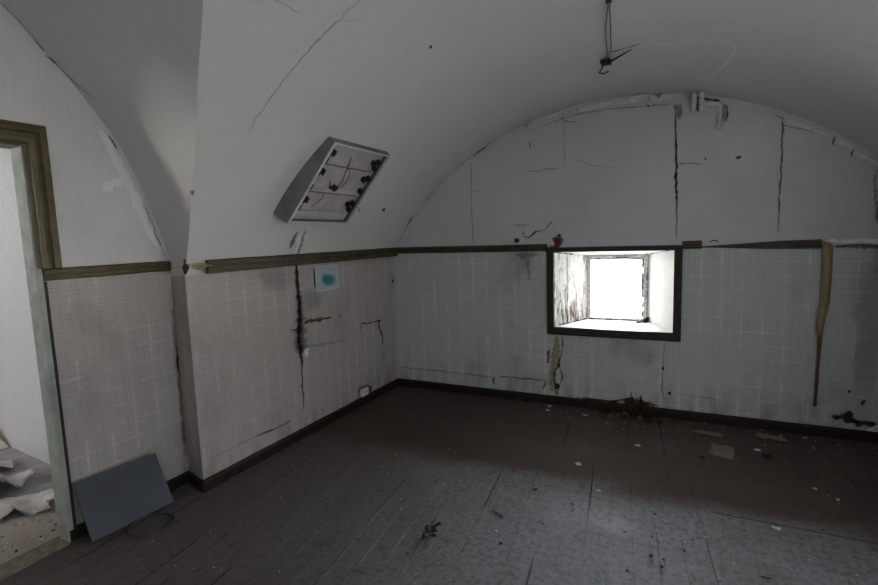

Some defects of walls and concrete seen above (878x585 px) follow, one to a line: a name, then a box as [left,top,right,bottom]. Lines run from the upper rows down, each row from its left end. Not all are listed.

crack [493,104,703,389]
crack [775,115,812,233]
crack [253,266,309,438]
crack [360,320,383,348]